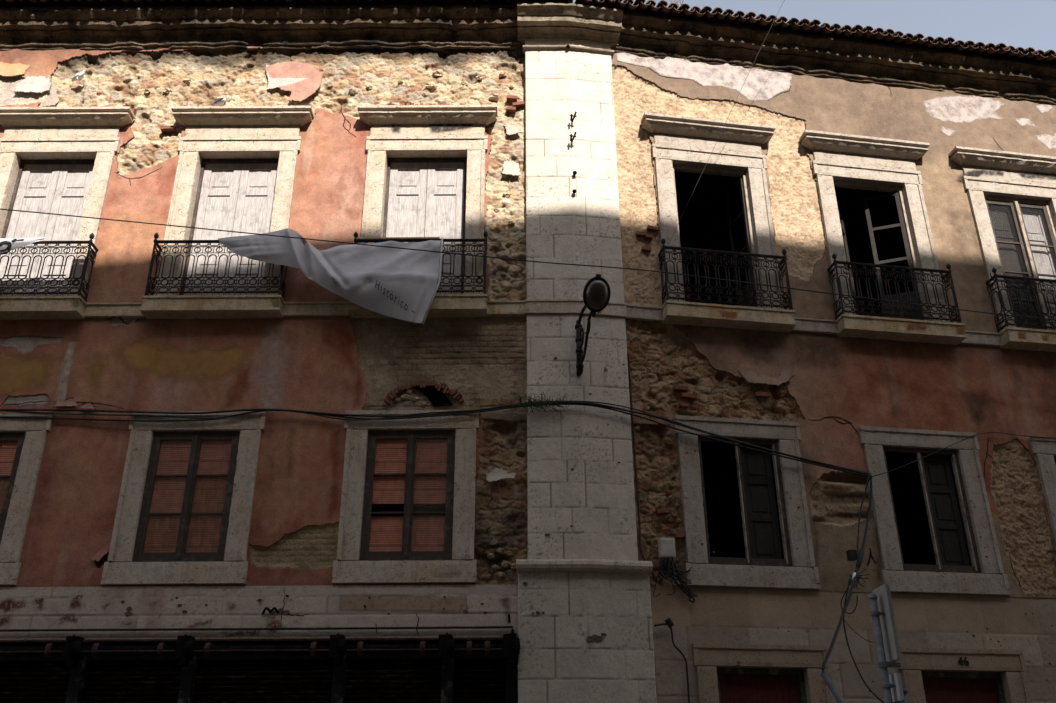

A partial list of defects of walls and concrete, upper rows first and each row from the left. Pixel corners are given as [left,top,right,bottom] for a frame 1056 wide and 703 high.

flaking render [0,62,59,107]
flaking render [265,65,307,90]
flaking render [504,123,521,136]
flaking render [502,160,521,176]
flaking render [612,52,826,307]
flaking render [486,468,516,482]
flaking render [797,472,874,527]
flaking render [249,522,339,570]